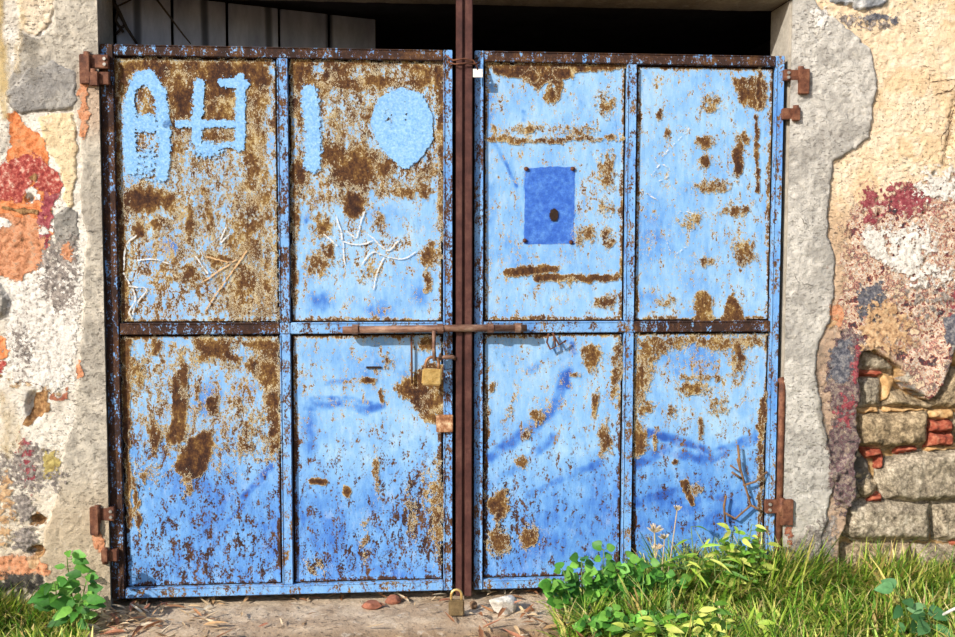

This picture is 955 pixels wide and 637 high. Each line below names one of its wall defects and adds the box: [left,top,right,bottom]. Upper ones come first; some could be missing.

corrosion [114,56,455,323]
corrosion [483,86,626,250]
corrosion [485,62,627,105]
corrosion [684,67,769,218]
spalling [809,4,899,37]
crack [926,66,955,166]
peeling [0,111,84,595]
corrosion [120,334,281,537]
corrosion [359,334,453,425]
corrosion [503,262,621,311]
corrosion [569,289,768,460]
peeling [826,156,955,571]